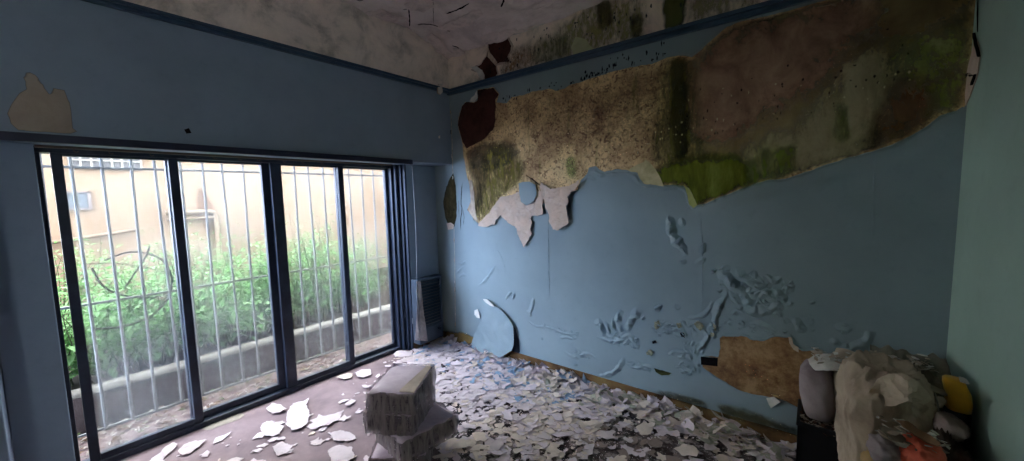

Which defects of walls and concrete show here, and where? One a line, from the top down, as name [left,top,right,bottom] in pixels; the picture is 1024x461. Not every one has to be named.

peeling [8,73,77,134]
peeling [443,0,981,247]
water stain [503,0,970,205]
water stain [467,142,525,220]
peeling [699,333,818,408]